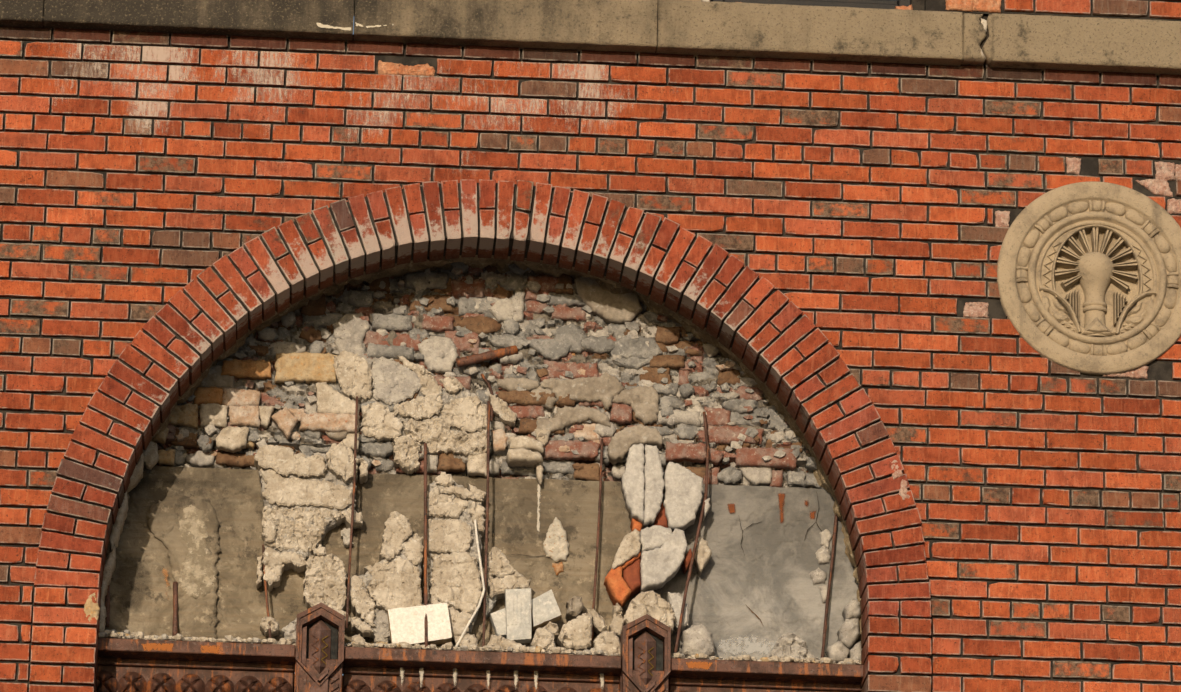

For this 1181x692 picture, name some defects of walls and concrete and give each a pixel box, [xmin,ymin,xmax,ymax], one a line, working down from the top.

crack [979,15,989,62]
damp [122,46,192,128]
damp [215,50,293,95]
damp [491,97,543,118]
damp [559,64,613,122]
spalling [1135,161,1181,214]
spalling [333,350,517,475]
peeling [607,424,712,593]
spalling [254,441,531,647]
rust [142,643,174,651]
rust [201,645,220,654]
rust [686,661,712,669]